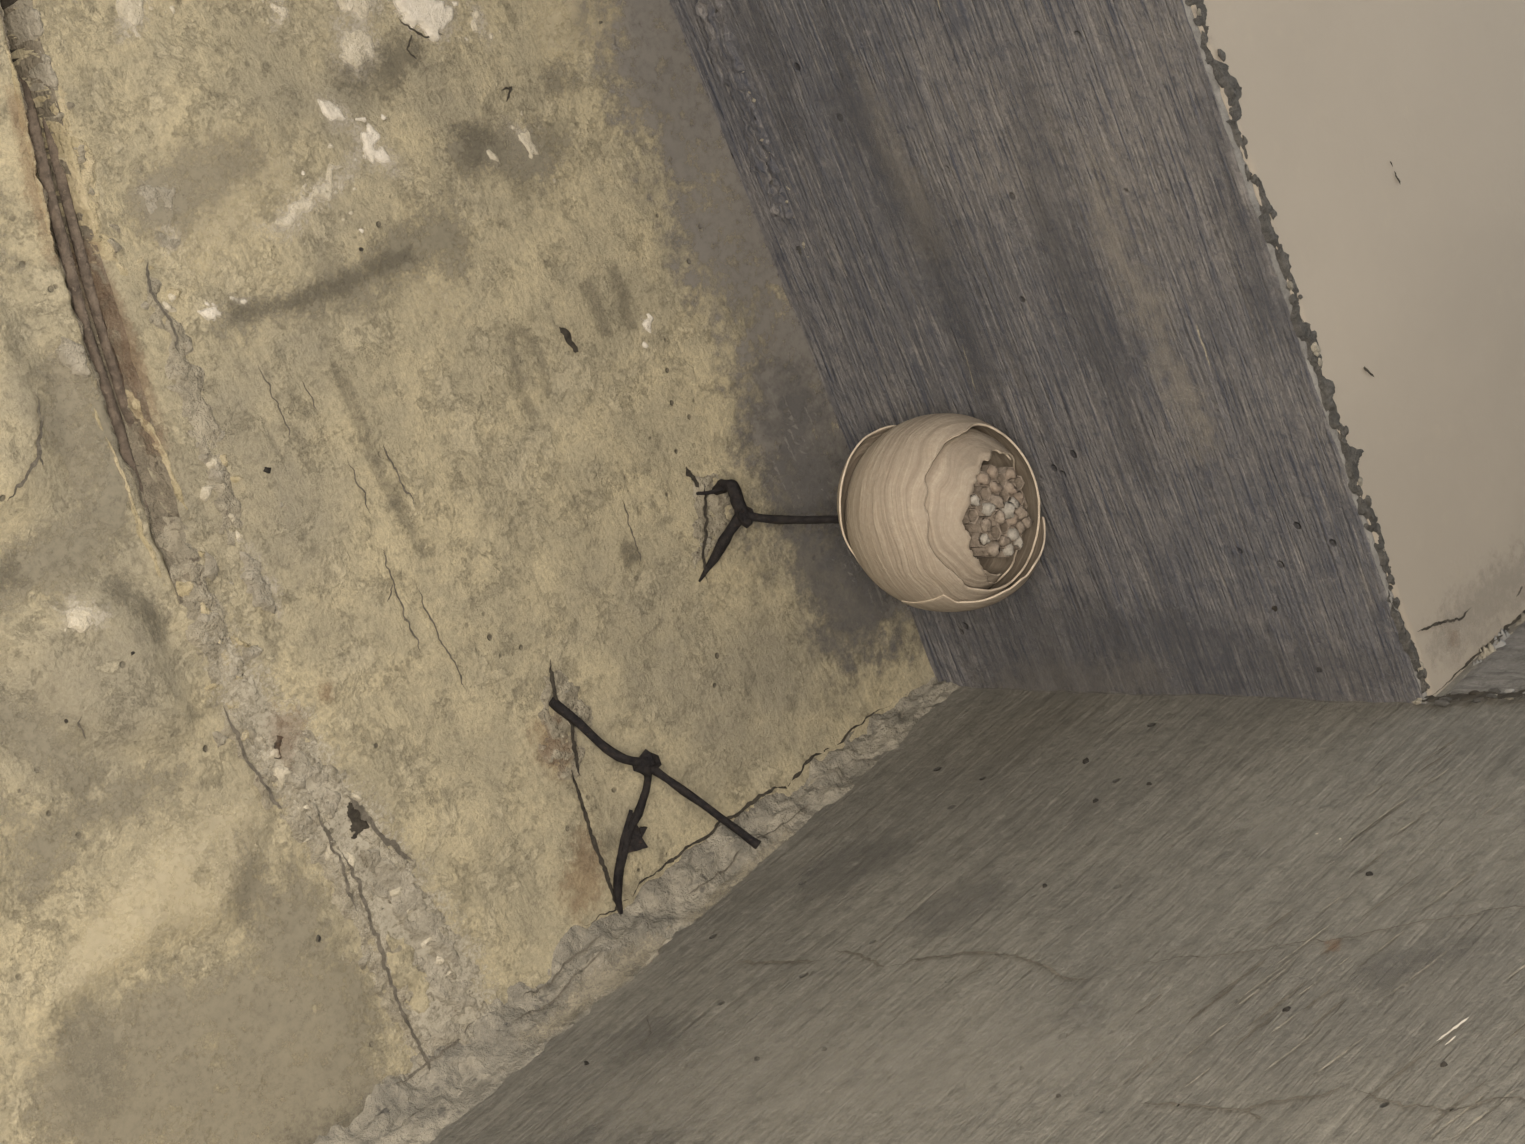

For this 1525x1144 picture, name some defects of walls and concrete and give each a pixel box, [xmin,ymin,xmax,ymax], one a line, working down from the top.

peeling [336,0,501,71]
peeling [274,99,391,228]
leakage [446,117,574,185]
peeling [508,111,541,159]
flaking render [5,0,248,547]
leakage [582,0,914,671]
crack [7,397,44,501]
peeling [64,607,95,633]
flaking render [156,514,499,1071]
flaking render [538,659,621,916]